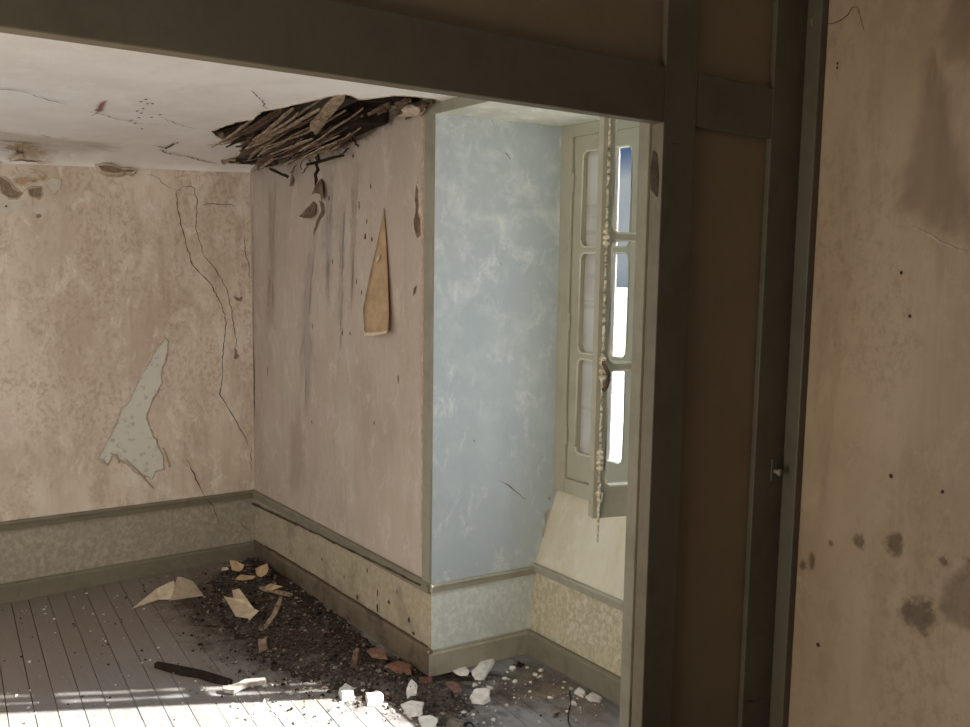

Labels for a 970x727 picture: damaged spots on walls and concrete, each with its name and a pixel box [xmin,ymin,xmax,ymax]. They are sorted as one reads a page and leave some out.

crack [6,135,50,173]
spalling [211,94,441,164]
spalling [0,175,43,207]
peeling [299,201,317,218]
crack [147,119,255,466]
spalling [96,337,170,488]
crack [186,459,428,647]